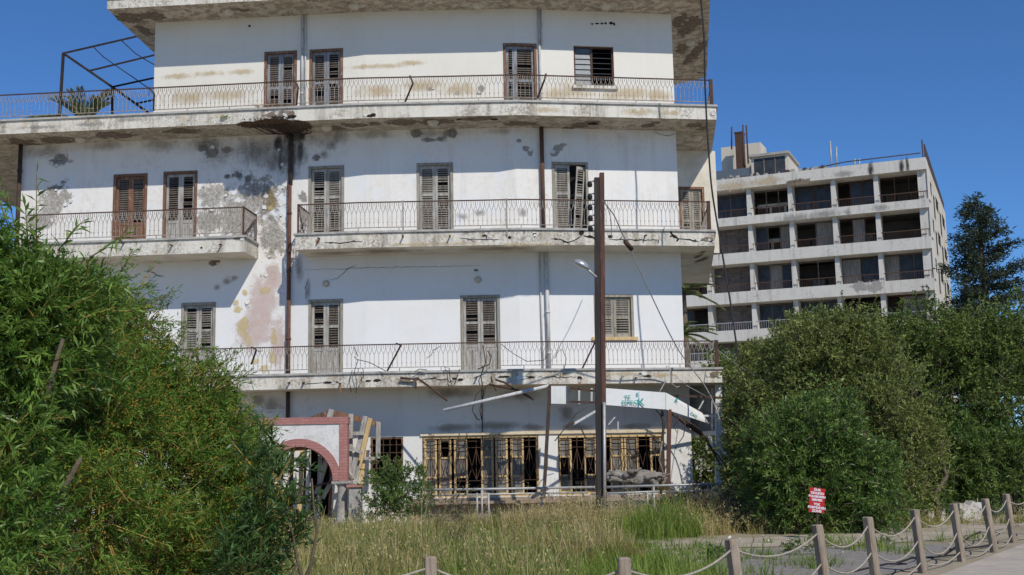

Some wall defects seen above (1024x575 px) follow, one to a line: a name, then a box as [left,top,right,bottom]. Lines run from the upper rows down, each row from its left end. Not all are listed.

spalling [5,136,75,168]
spalling [93,131,139,139]
peeling [24,178,73,232]
peeling [162,128,307,373]
crack [305,238,499,289]
crack [551,230,699,243]